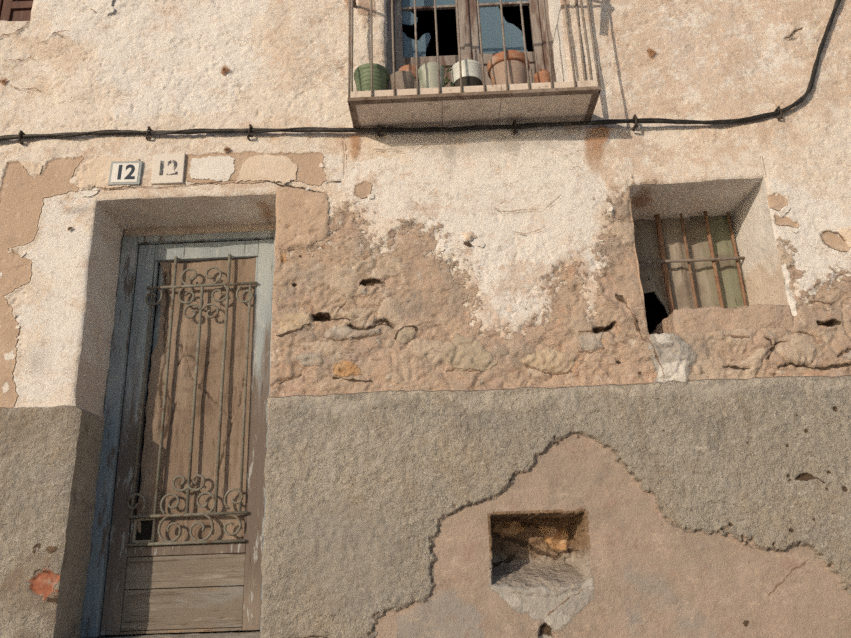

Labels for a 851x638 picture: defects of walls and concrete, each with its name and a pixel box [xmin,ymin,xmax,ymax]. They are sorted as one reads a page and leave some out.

peeling [165,150,326,191]
peeling [0,155,139,408]
flaking render [268,174,851,397]
flaking render [29,543,60,603]
spalling [369,431,851,638]